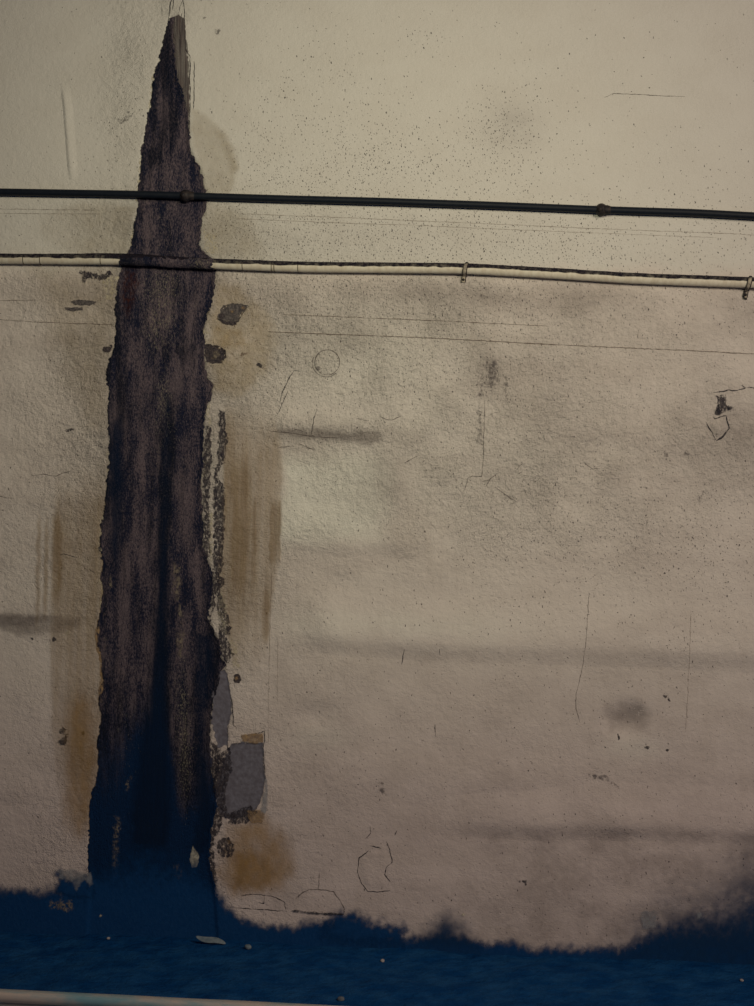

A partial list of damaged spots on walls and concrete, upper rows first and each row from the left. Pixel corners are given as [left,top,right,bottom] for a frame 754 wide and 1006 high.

water stain [127,15,211,258]
crack [168,0,195,129]
water stain [0,266,754,965]
spalling [211,640,266,824]
spalling [217,837,234,858]